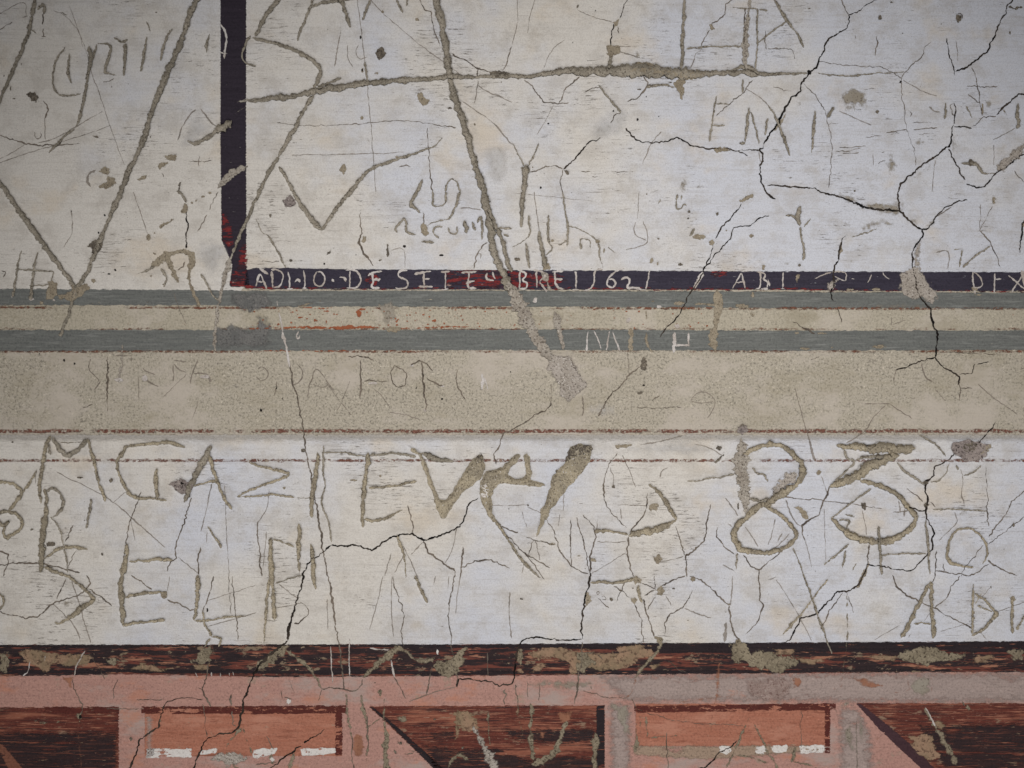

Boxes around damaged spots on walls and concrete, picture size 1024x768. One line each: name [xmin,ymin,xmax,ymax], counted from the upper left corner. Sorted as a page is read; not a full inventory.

crack [526,0,1024,385]
crack [193,493,648,768]
crack [493,397,552,463]
crack [786,424,1024,642]